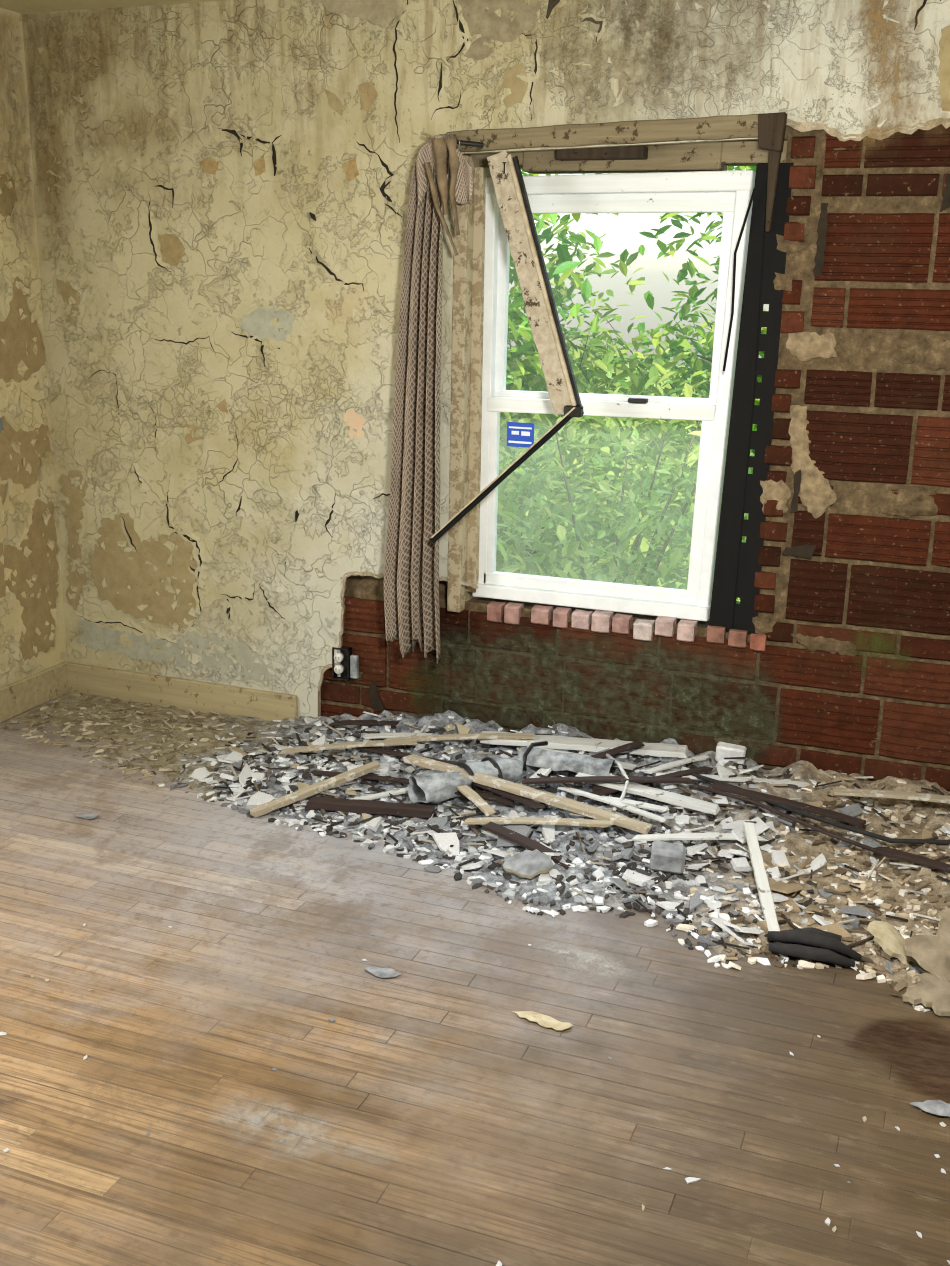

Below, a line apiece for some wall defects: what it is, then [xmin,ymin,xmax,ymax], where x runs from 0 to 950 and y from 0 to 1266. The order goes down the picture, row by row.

crack [218,129,283,176]
crack [354,0,412,217]
crack [431,0,472,122]
damp [620,0,685,72]
damp [859,0,912,138]
crack [148,185,174,272]
crack [305,212,364,293]
peeling [0,272,46,387]
crack [151,332,282,367]
spalling [318,19,950,792]
peeling [0,412,202,665]
crack [73,365,340,644]